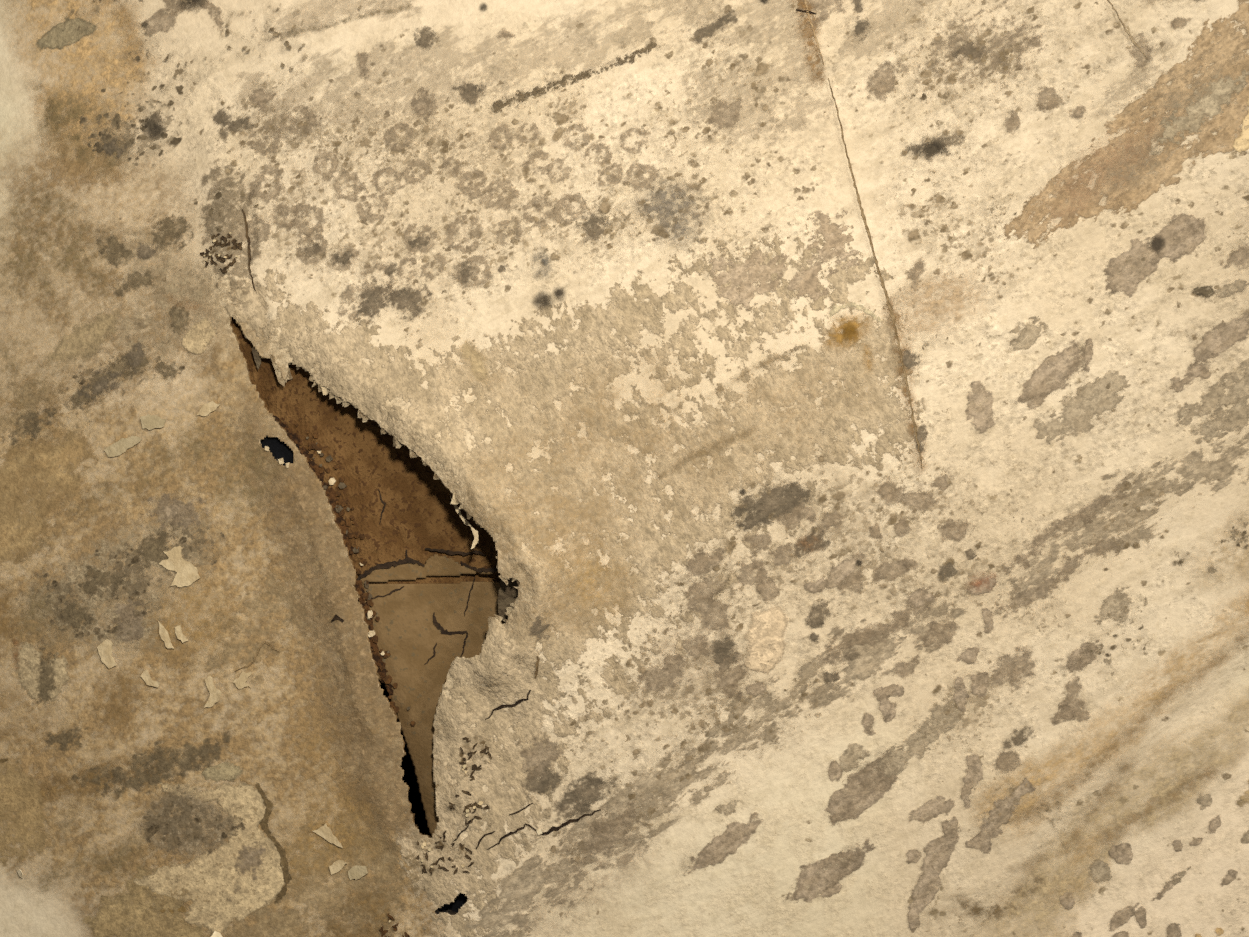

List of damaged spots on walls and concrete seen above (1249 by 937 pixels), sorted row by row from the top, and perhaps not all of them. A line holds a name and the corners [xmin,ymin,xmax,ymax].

damp [213,42,785,332]
crack [796,0,922,468]
peeling [1004,0,1249,249]
crack [1108,0,1148,60]
damp [0,0,440,937]
peeling [225,209,926,937]
damp [467,432,1249,937]
damp [915,425,928,452]
peeling [906,754,1036,932]